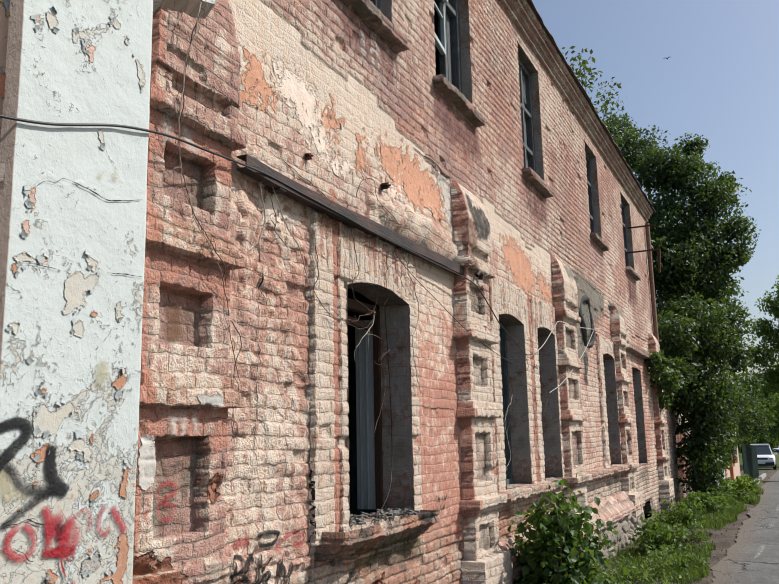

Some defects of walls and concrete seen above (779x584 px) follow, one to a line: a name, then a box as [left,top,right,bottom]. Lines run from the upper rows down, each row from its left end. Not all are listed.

peeling [237,42,470,240]
peeling [21,183,37,239]
crack [38,178,134,201]
peeling [12,251,50,277]
peeling [62,250,101,338]
peeling [499,233,566,305]
peeling [112,367,127,401]
crack [250,249,267,531]
peeling [31,382,77,467]
peeling [68,430,94,464]
spalling [195,472,223,504]
spalling [80,532,189,584]